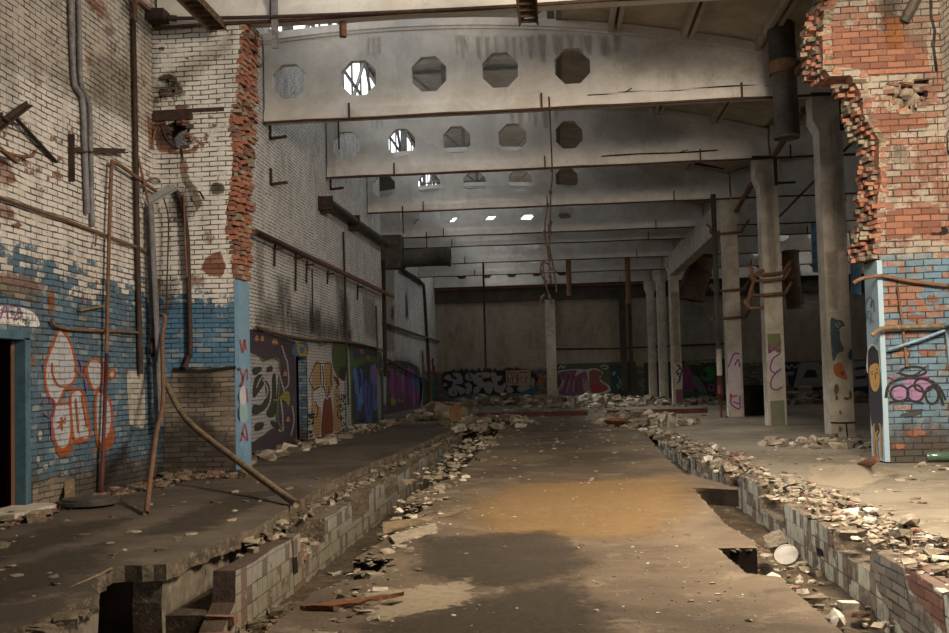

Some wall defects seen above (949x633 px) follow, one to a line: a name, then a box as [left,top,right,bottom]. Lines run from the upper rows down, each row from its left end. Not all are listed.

spalling [154,74,199,154]
spalling [191,24,262,285]
spalling [798,0,948,263]
peeling [898,349,936,357]
water stain [359,477,682,633]